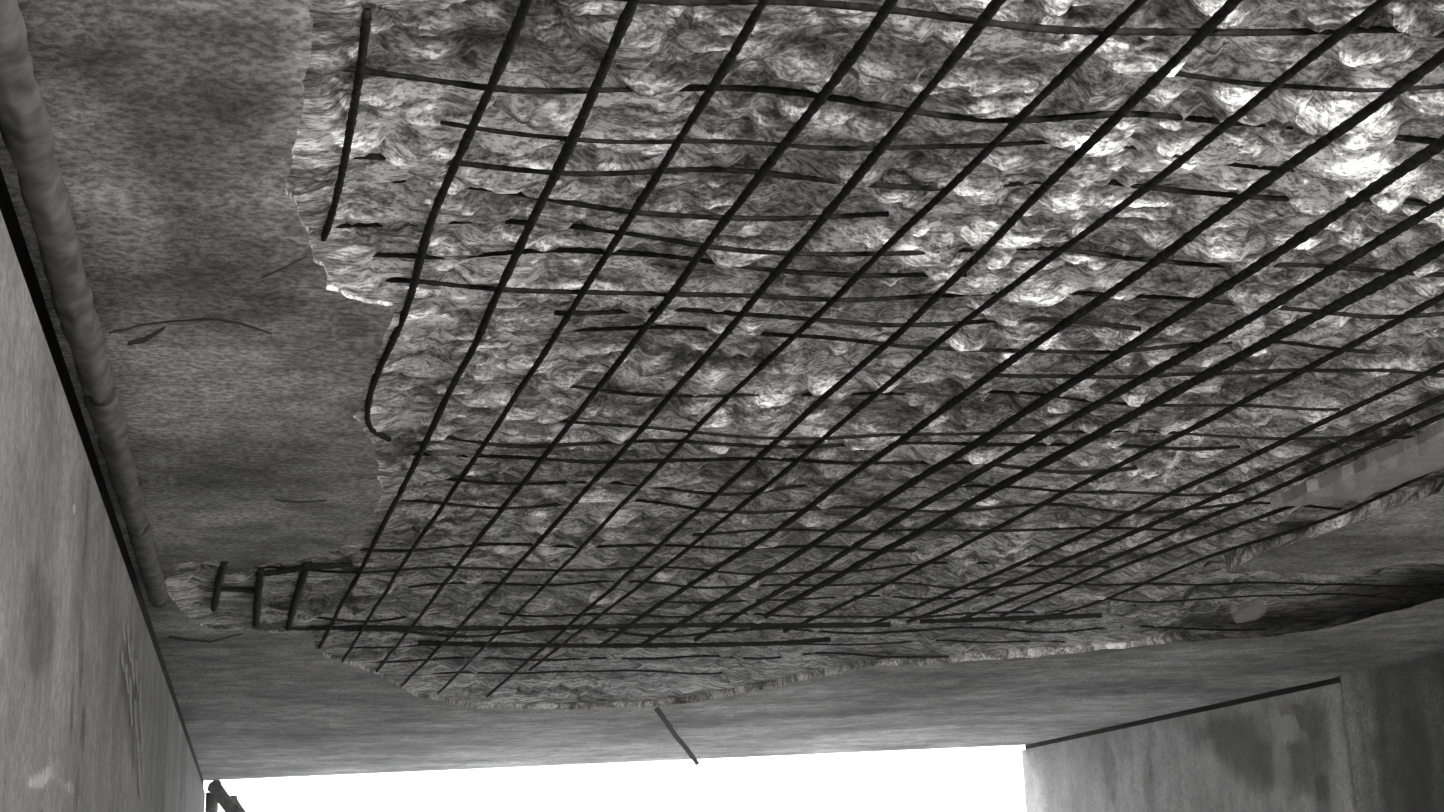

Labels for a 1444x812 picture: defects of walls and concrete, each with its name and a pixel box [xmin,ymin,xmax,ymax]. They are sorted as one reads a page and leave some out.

spalling [165,0,1444,709]